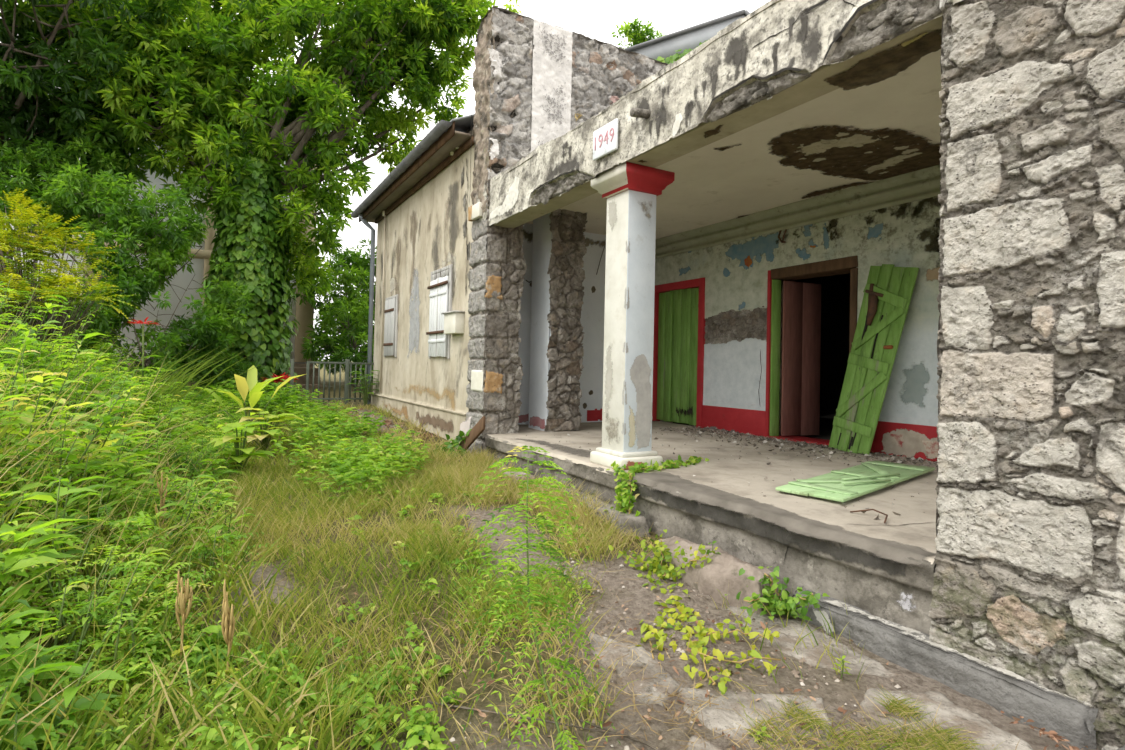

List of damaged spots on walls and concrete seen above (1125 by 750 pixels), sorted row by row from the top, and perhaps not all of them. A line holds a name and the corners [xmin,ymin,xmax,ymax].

spalling [824,0,953,90]
spalling [706,73,812,123]
spalling [531,173,596,205]
peeling [794,132,922,199]
leakage [380,216,421,313]
leakage [432,182,458,298]
peeling [723,233,779,277]
leakage [408,386,455,432]
spalling [622,342,653,470]